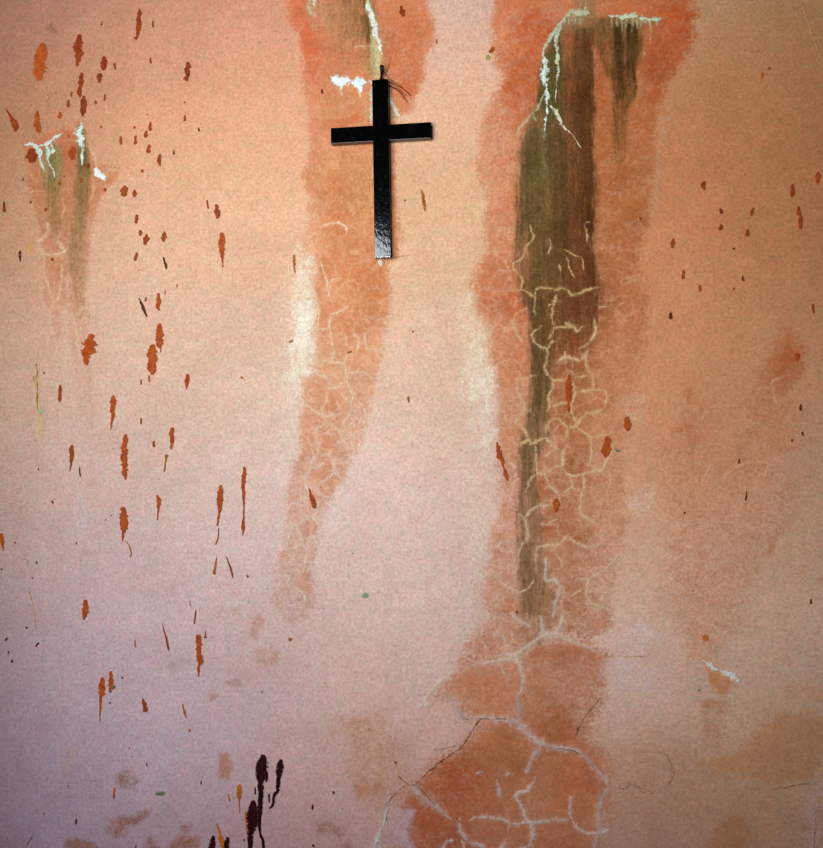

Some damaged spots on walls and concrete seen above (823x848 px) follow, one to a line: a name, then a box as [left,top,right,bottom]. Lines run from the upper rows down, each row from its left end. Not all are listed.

leakage [24,123,119,415]
leakage [271,0,698,848]
crack [376,226,646,848]
leakage [665,327,804,706]